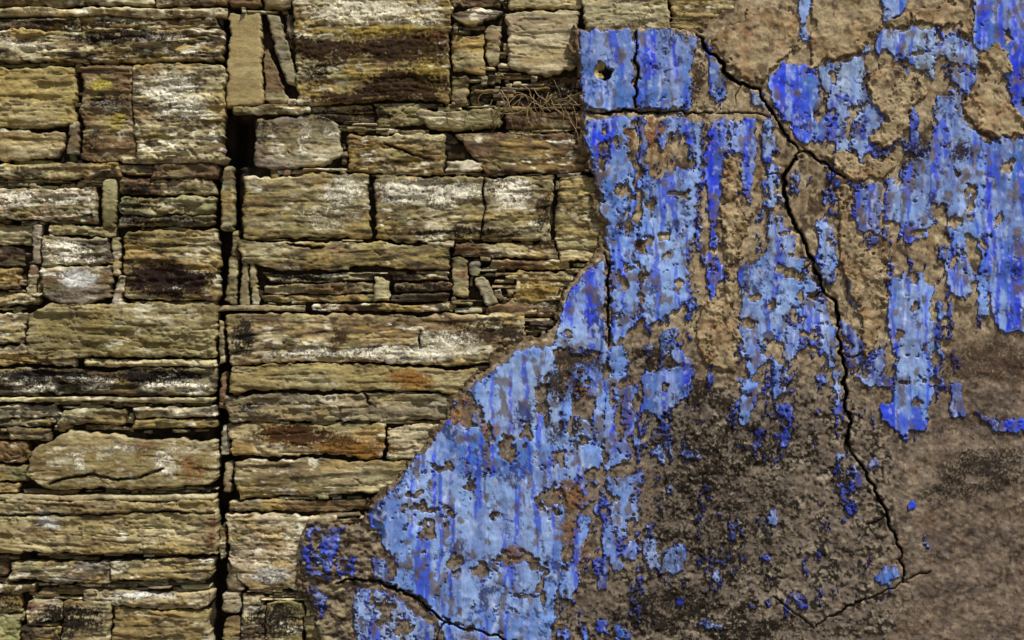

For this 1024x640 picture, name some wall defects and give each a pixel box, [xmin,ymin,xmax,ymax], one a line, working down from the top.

crack [337,578,504,640]
peeling [241,0,1024,640]
crack [586,33,928,629]